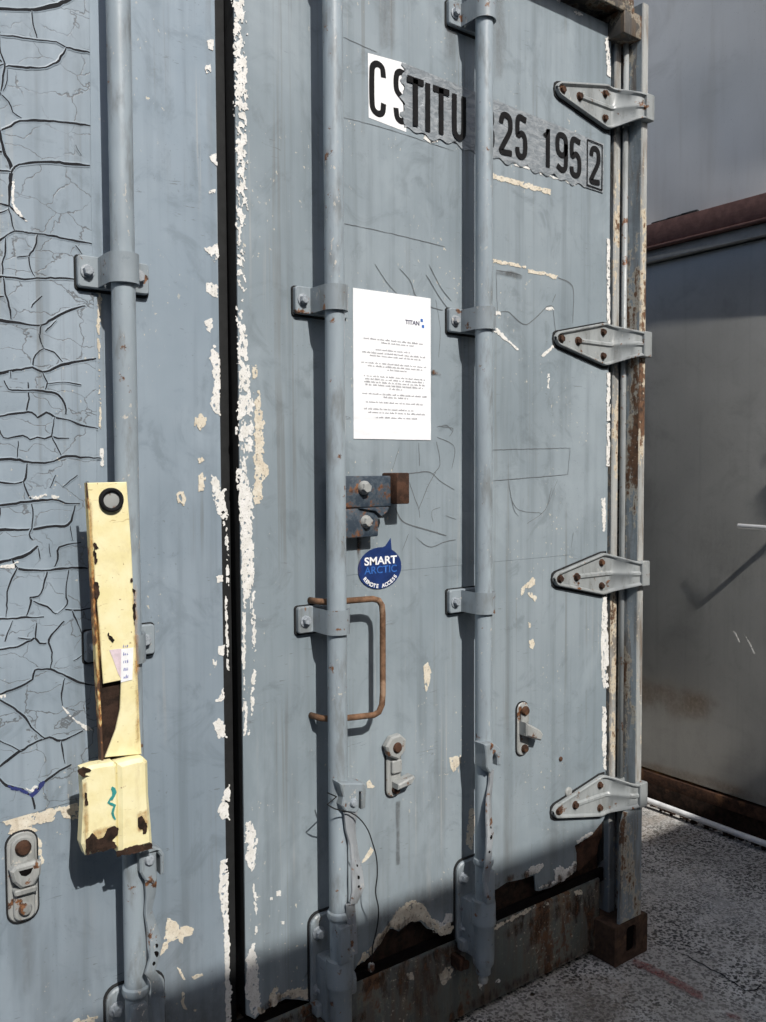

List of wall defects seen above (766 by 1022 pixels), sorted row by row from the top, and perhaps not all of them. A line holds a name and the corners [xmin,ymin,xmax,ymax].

peeling [493,172,575,195]
peeling [493,259,558,279]
peeling [194,0,269,739]
crack [0,0,101,810]
peeling [217,784,231,820]
peeling [244,821,258,872]
peeling [528,861,577,889]
peeling [160,918,194,956]
peeling [218,858,233,1022]
peeling [357,900,454,965]
peeling [245,926,308,1017]
crack [683,954,761,991]